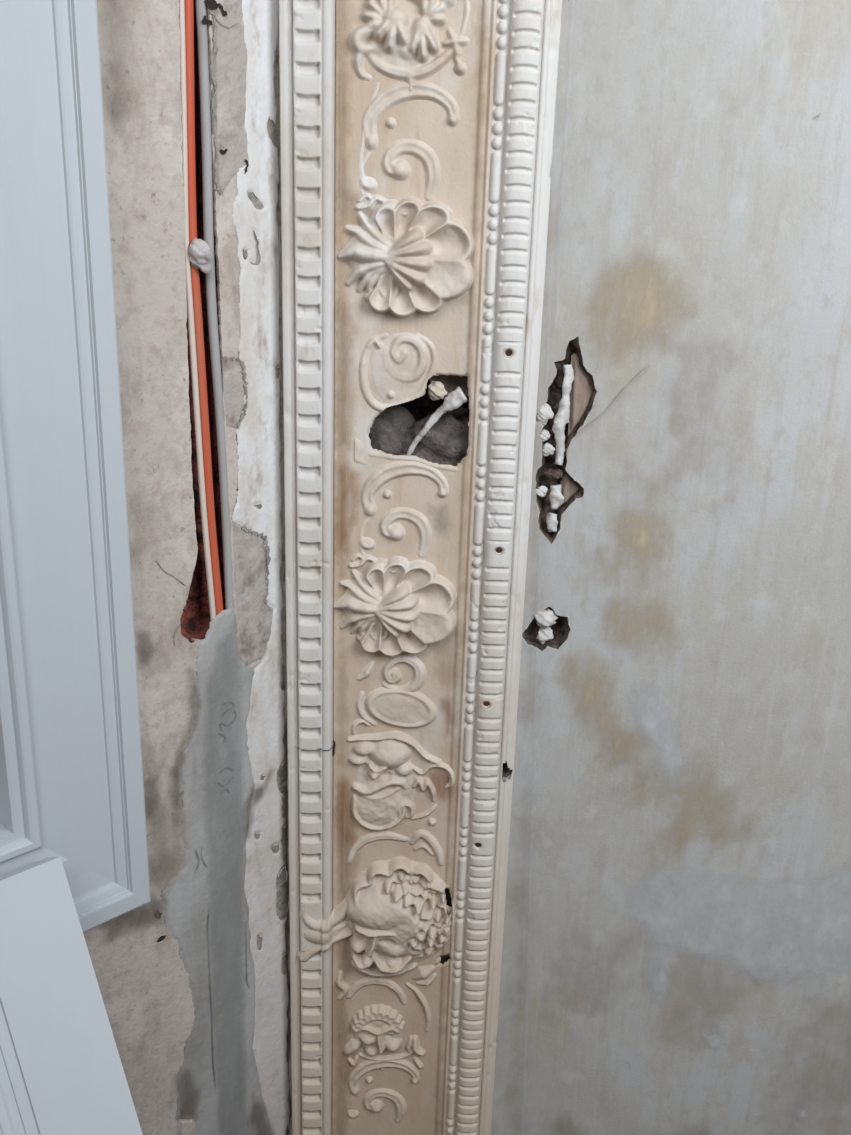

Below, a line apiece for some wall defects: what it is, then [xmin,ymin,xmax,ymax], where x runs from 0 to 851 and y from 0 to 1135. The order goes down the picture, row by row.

spalling [355,375,470,472]
spalling [535,335,597,545]
peeling [178,0,292,1135]
spalling [522,606,571,651]